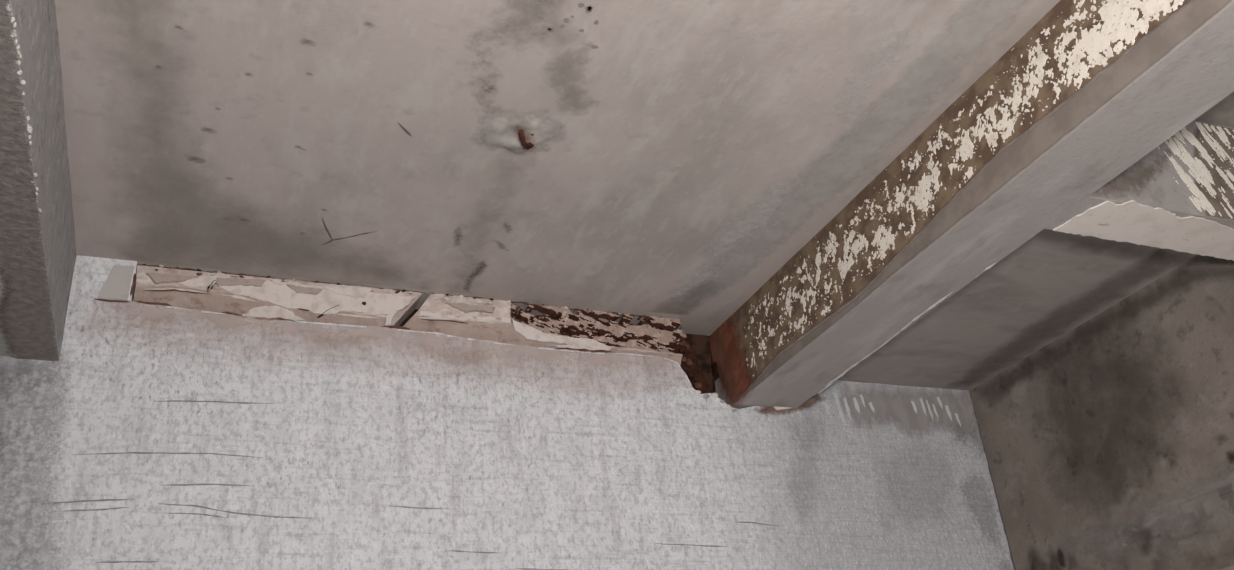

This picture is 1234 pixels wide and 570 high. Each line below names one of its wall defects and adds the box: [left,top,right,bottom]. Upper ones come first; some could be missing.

spalling [5,4,42,233]
damp [535,0,599,32]
peeling [130,0,1234,414]
corrosion [710,317,751,404]
damp [823,256,1164,570]